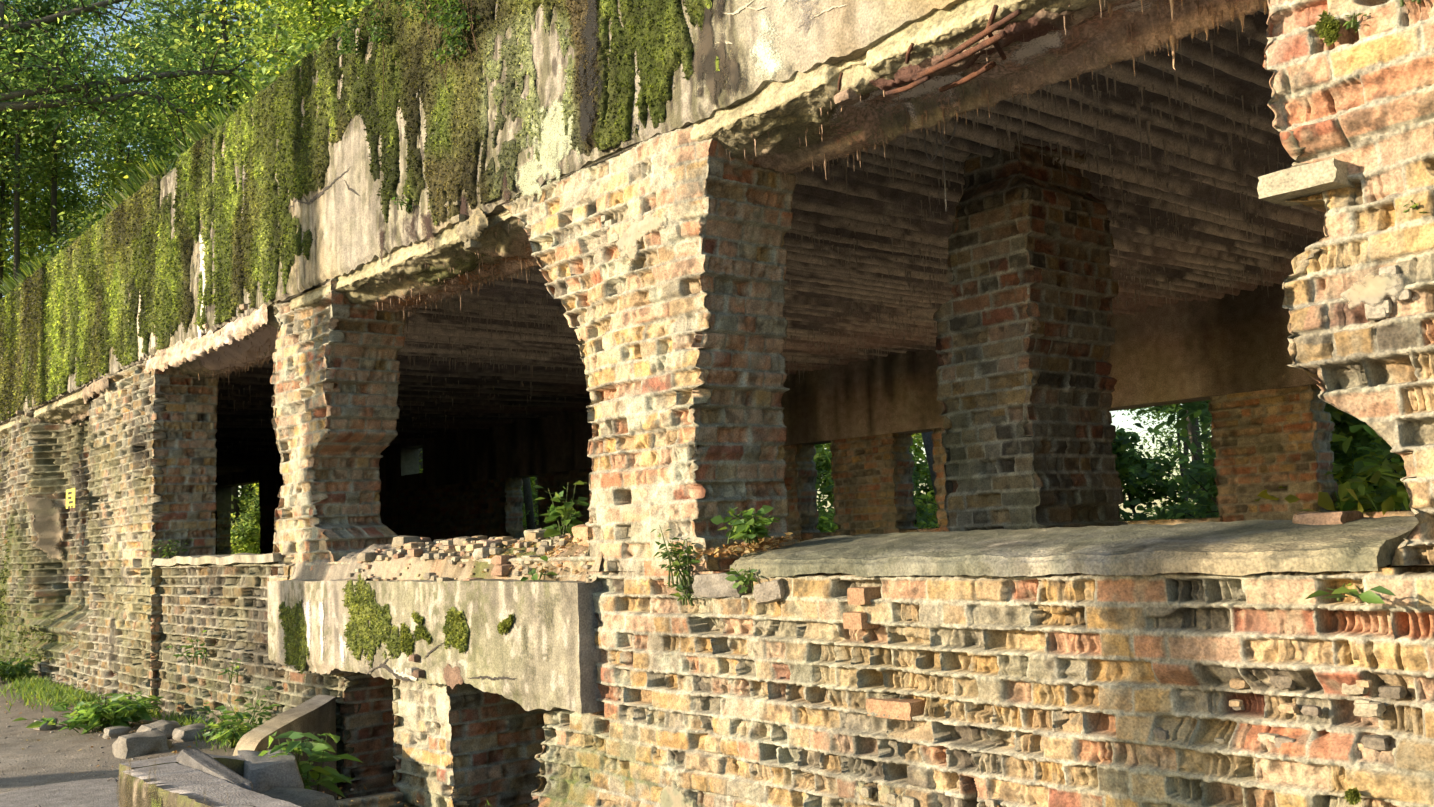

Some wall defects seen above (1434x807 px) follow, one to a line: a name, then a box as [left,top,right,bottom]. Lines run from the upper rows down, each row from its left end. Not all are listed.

water stain [833,72,963,124]
corrosion [823,0,1181,146]
water stain [1000,29,1069,67]
water stain [403,212,495,288]
water stain [137,292,155,361]
water stain [197,234,278,371]
flaking render [1340,265,1412,321]
water stain [116,761,169,807]